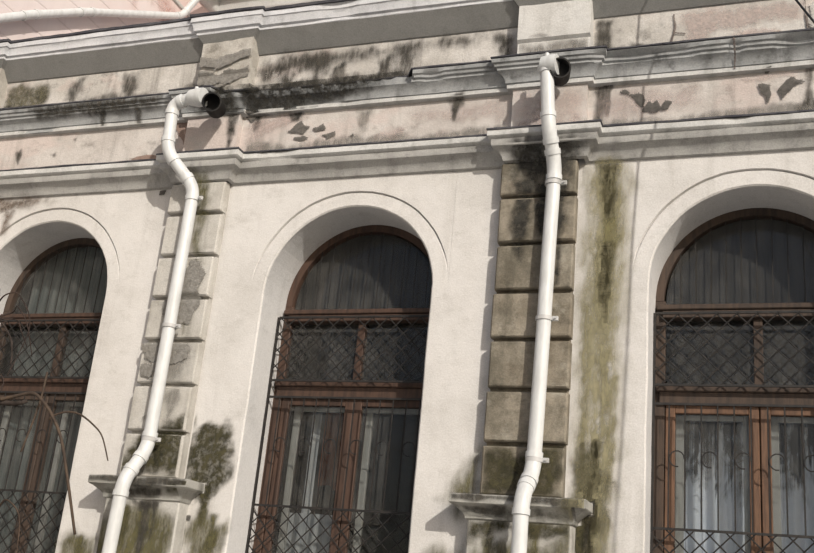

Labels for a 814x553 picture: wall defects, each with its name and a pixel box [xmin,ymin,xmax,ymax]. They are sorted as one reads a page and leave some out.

damp [496,36,512,55]
damp [6,76,158,125]
flaking render [242,110,335,151]
damp [208,43,419,147]
damp [420,128,486,139]
damp [452,93,463,119]
flaking render [620,89,672,113]
flaking render [758,77,805,103]
damp [511,137,547,255]
damp [528,136,622,553]
damp [198,483,216,551]
damp [452,449,525,553]